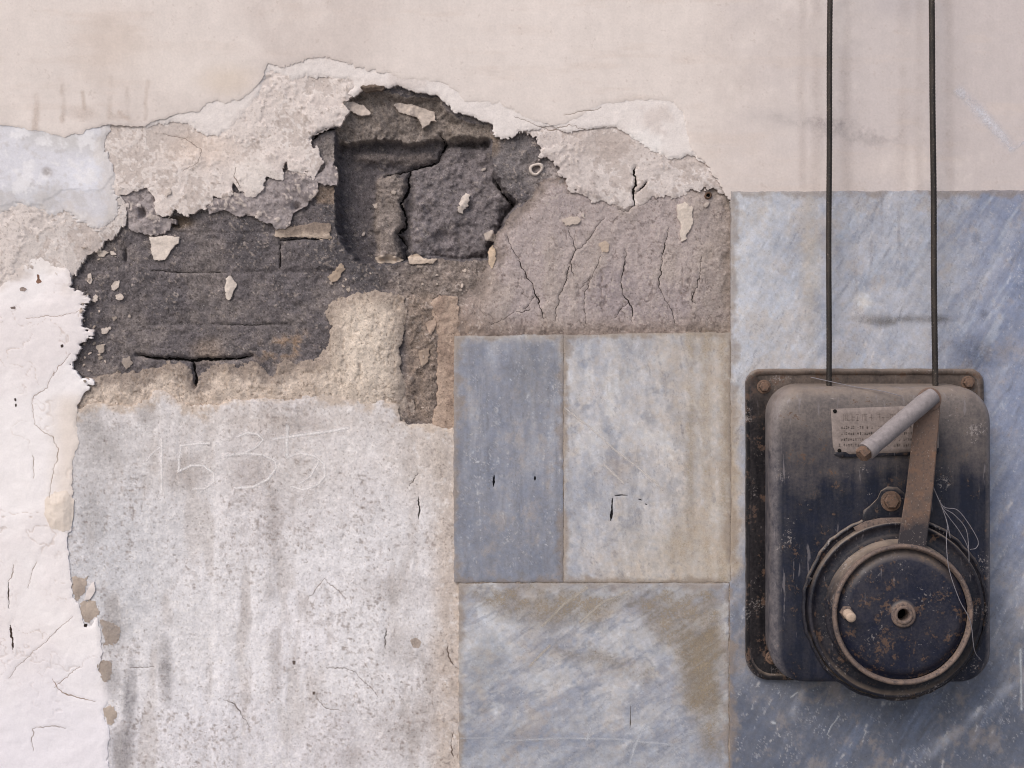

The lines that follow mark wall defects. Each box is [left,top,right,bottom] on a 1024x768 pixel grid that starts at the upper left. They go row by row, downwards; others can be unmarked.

spalling [0,70,731,429]
crack [491,167,647,325]
crack [658,228,702,323]
crack [139,355,249,387]
peeling [72,576,121,646]
peeling [97,660,112,682]
peeling [103,705,117,725]